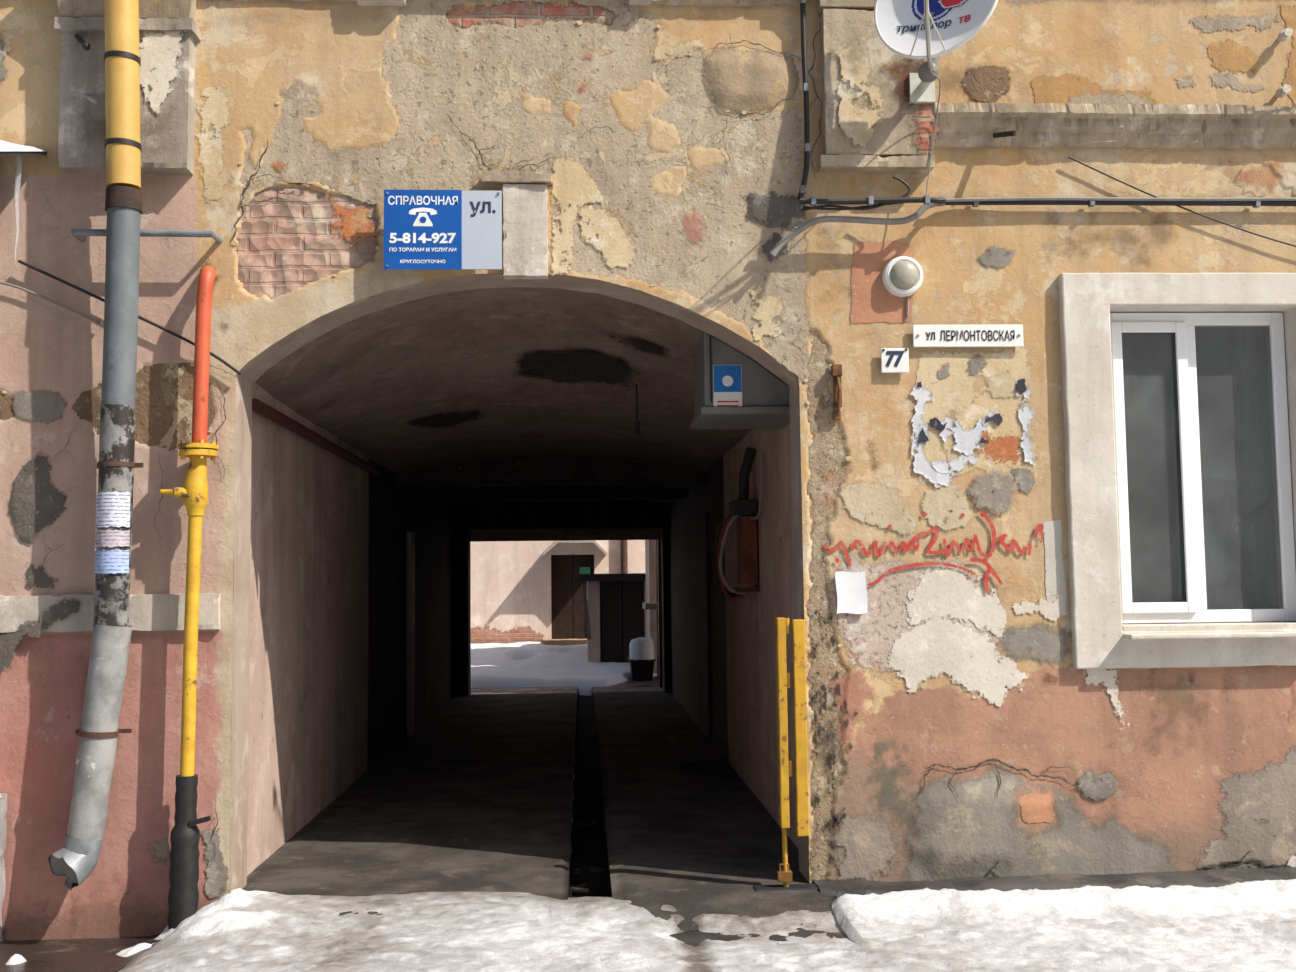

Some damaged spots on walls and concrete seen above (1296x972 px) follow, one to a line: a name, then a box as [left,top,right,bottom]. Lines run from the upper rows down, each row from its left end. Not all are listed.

peeling [139,31,187,114]
peeling [0,390,15,420]
peeling [72,383,102,435]
peeling [135,363,215,451]
peeling [195,0,1039,884]
crack [916,758,1080,797]
peeling [1018,793,1053,824]